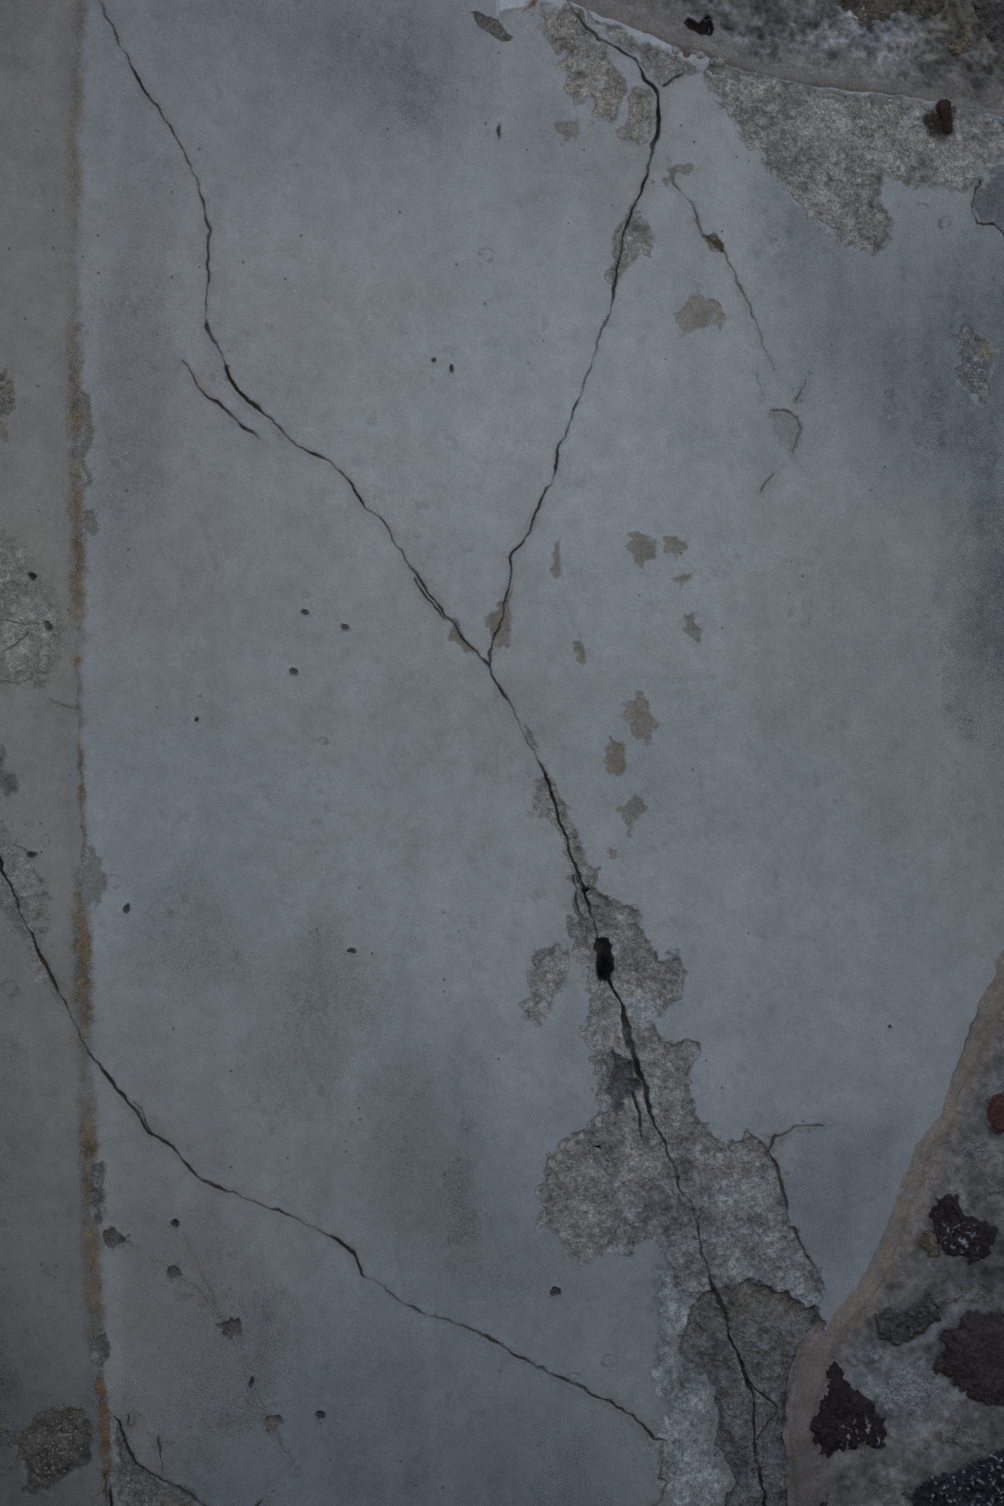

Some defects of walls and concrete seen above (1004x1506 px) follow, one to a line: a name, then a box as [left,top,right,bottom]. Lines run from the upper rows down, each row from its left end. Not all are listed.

crack [579,18,682,297]
spalling [473,0,1004,253]
peeling [605,199,652,284]
crack [192,365,263,432]
crack [415,380,585,699]
peeling [627,532,686,567]
peeling [605,691,656,775]
crack [539,763,591,916]
crack [88,1053,228,1192]
crack [603,959,681,1192]
spalling [519,776,826,1506]
spalling [0,1408,93,1494]